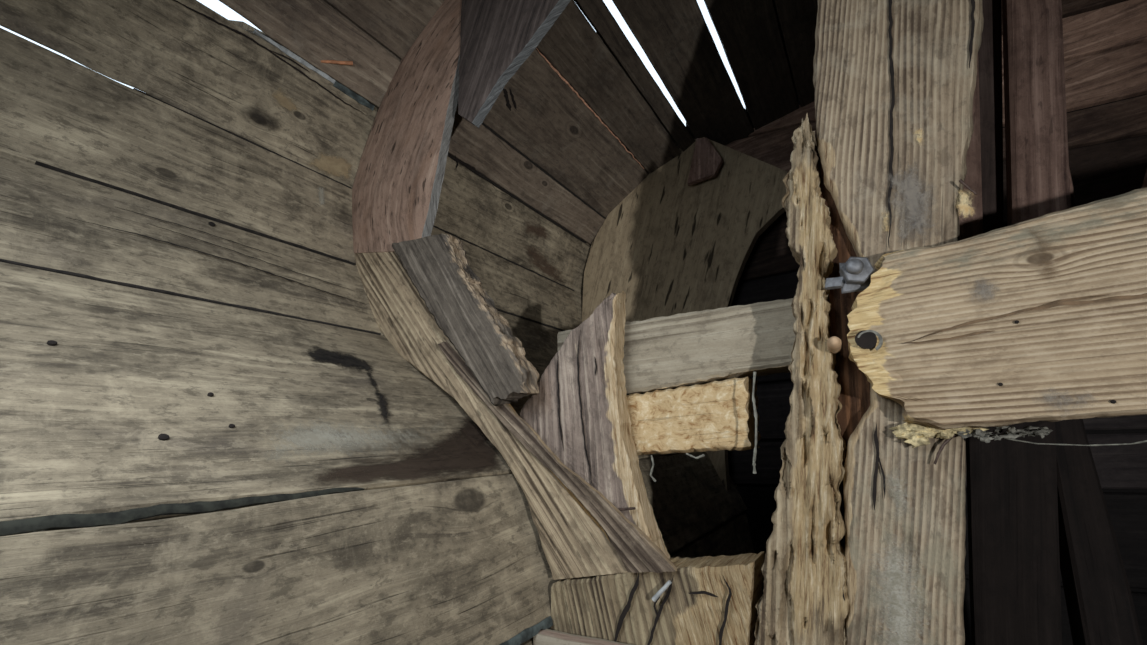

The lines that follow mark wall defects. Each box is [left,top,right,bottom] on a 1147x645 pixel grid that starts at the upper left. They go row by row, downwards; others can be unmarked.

crack [887,0,895,246]
damp [284,346,499,483]
crack [614,573,732,645]